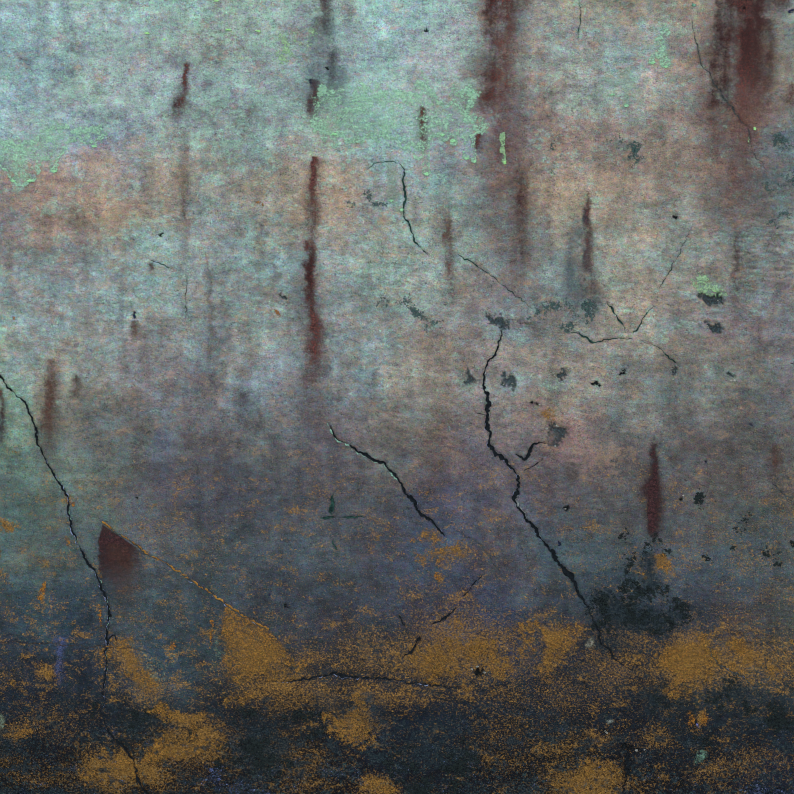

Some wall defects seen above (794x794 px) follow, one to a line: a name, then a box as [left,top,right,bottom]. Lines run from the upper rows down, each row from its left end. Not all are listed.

peeling [0,121,108,188]
peeling [304,70,490,176]
corrosion [711,0,773,141]
crack [368,161,428,255]
corrosion [302,156,323,382]
crack [0,375,149,794]
corrosion [98,525,136,581]
crack [321,423,505,658]
crack [477,324,631,670]
water stain [408,619,584,690]
water stain [102,701,222,777]
water stain [322,692,380,751]